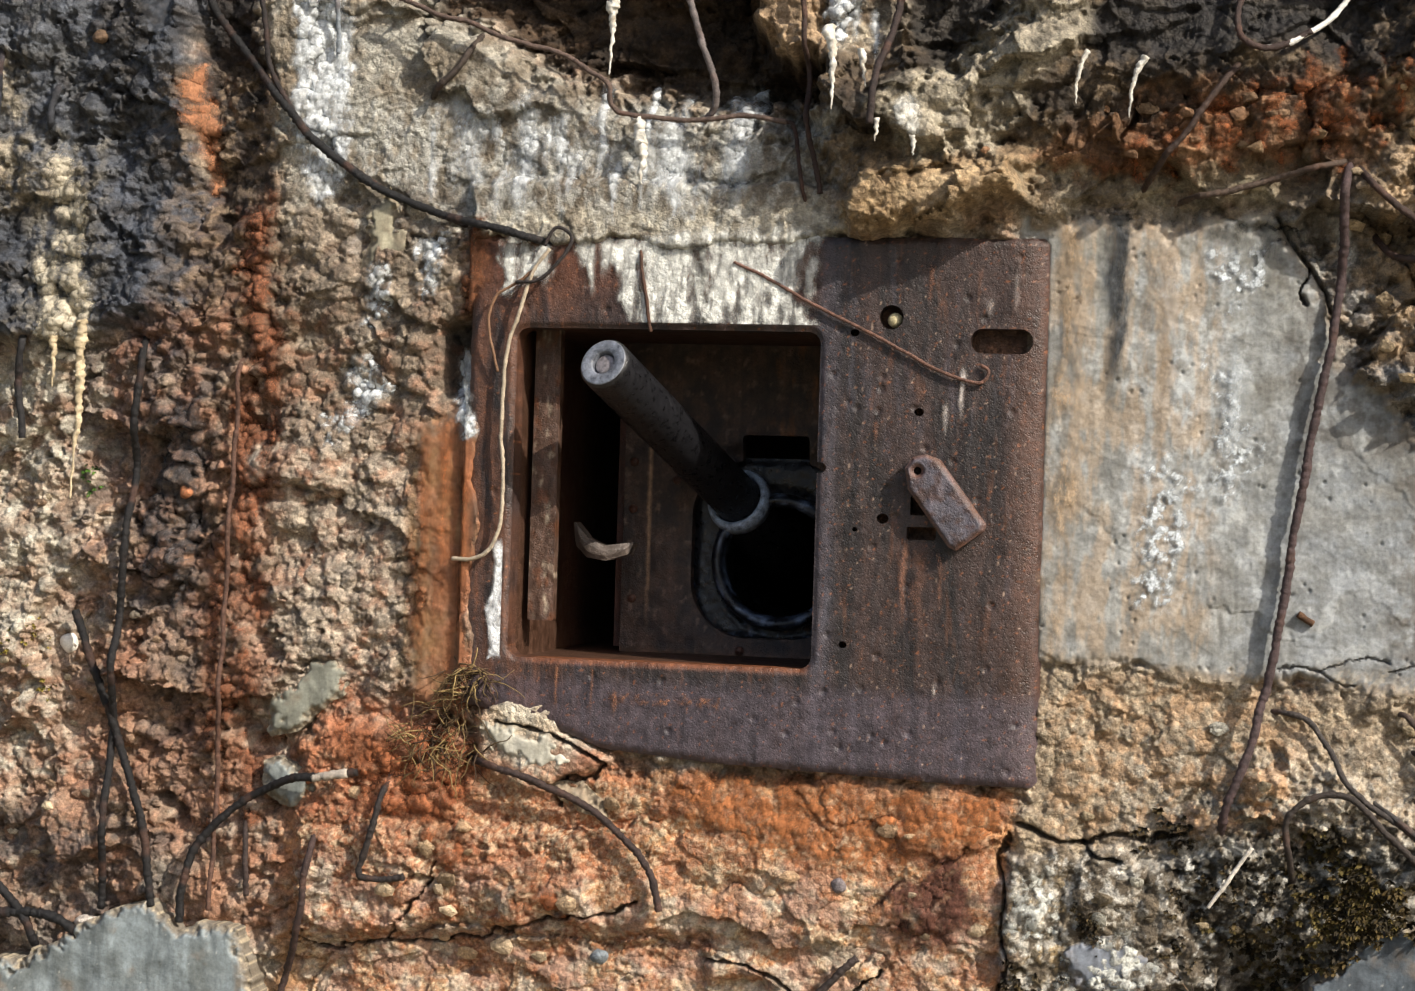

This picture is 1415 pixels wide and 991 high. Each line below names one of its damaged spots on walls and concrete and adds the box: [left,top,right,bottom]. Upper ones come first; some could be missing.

rust [180,64,225,197]
efflorescence [598,90,697,207]
spalling [438,0,1016,190]
efflorescence [34,155,93,360]
efflorescence [580,227,820,325]
rust [200,190,283,827]
spalling [0,314,267,991]
crack [289,859,638,951]
crack [706,958,791,991]
spalling [262,659,1415,991]
rust [672,774,1005,949]
crack [995,821,1188,991]